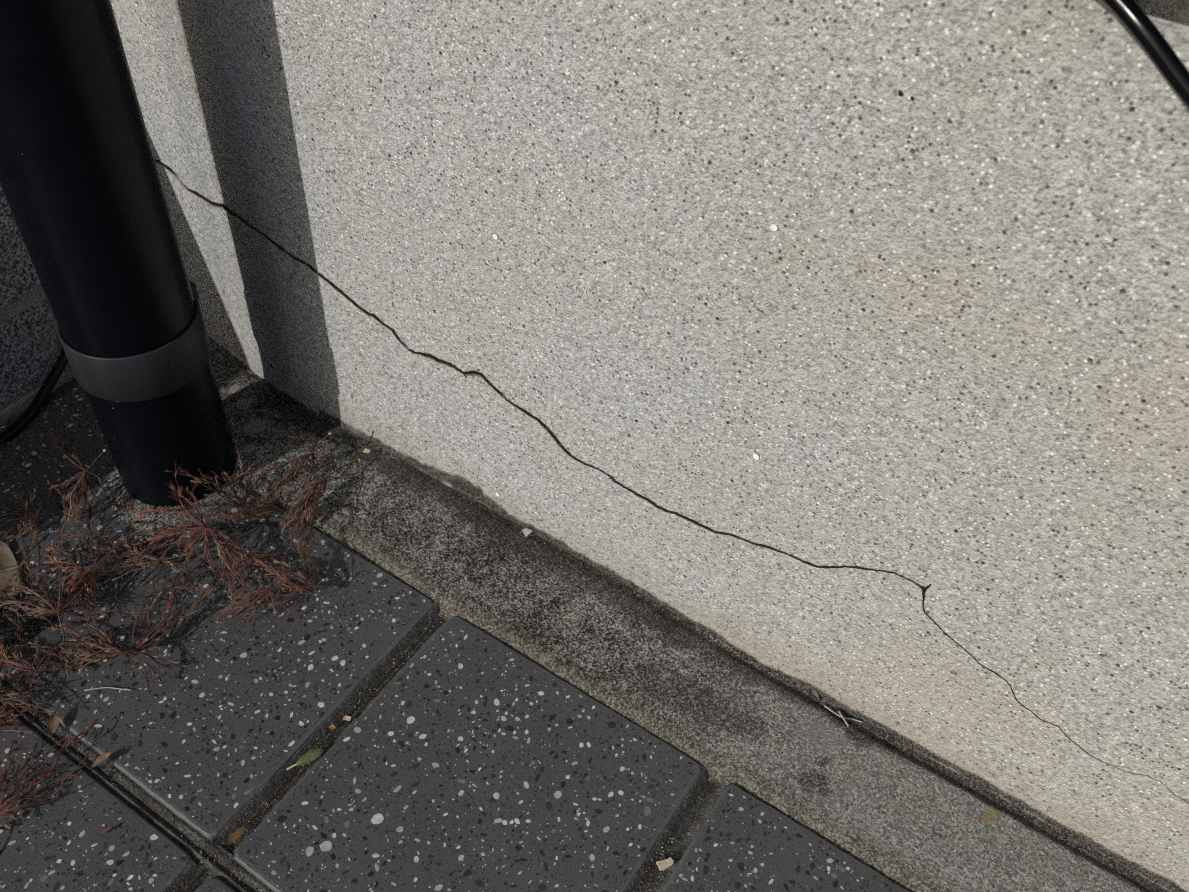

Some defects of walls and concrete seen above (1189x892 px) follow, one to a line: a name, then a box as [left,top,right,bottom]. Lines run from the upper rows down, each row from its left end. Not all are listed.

crack [155,160,1188,803]